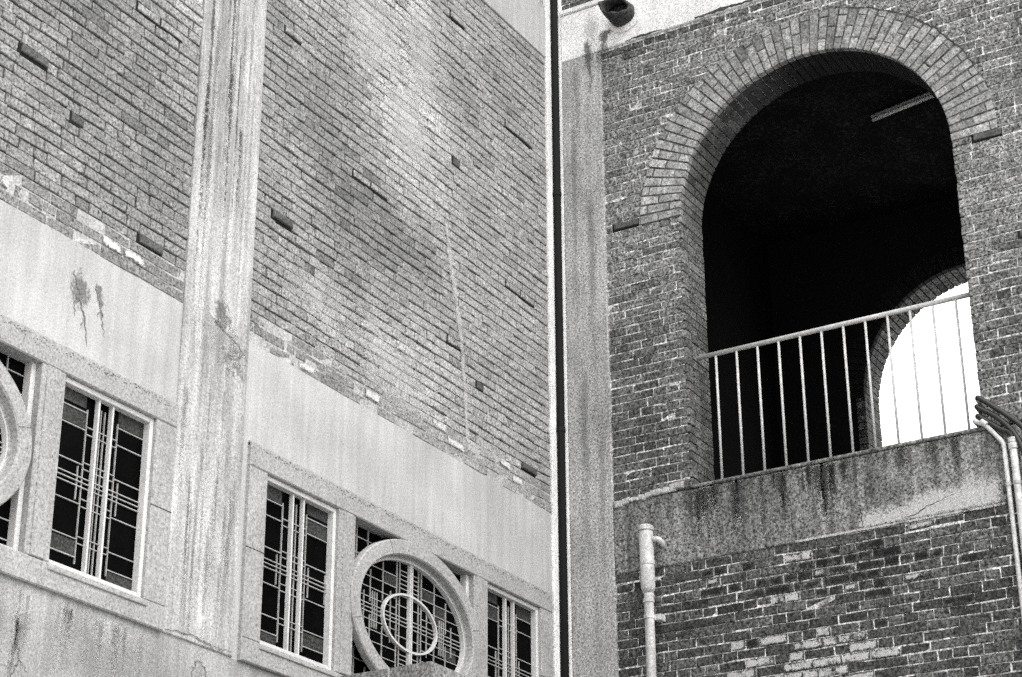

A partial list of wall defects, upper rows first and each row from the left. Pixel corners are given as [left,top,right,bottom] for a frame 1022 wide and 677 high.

damp [199,0,216,195]
damp [225,0,242,207]
damp [924,438,961,465]
damp [687,481,745,542]
damp [759,473,787,532]
damp [801,460,857,510]
damp [701,502,1005,611]
damp [728,627,899,677]